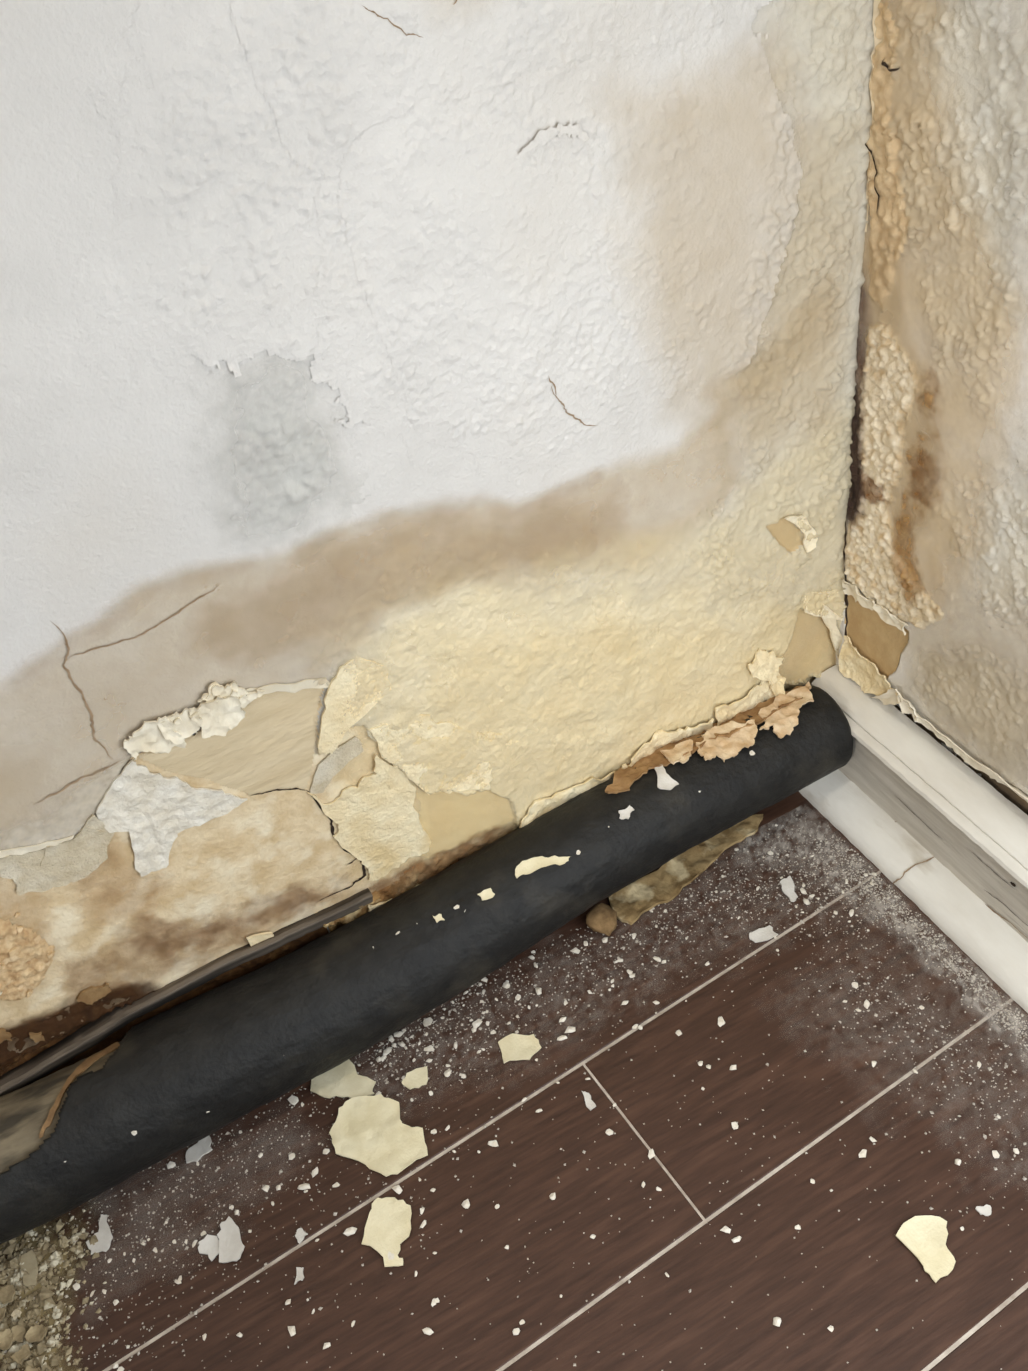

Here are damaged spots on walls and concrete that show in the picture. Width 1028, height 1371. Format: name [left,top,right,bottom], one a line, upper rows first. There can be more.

water stain [843,0,972,630]
crack [33,585,219,805]
flaking render [605,579,1028,820]
water stain [0,760,128,850]
peeling [0,657,520,1079]
peeling [515,855,570,878]
peeling [780,876,798,902]
crack [893,857,934,884]
peeling [749,925,778,943]
water stain [0,983,158,1069]
peeling [310,1059,376,1098]
peeling [402,1066,428,1090]